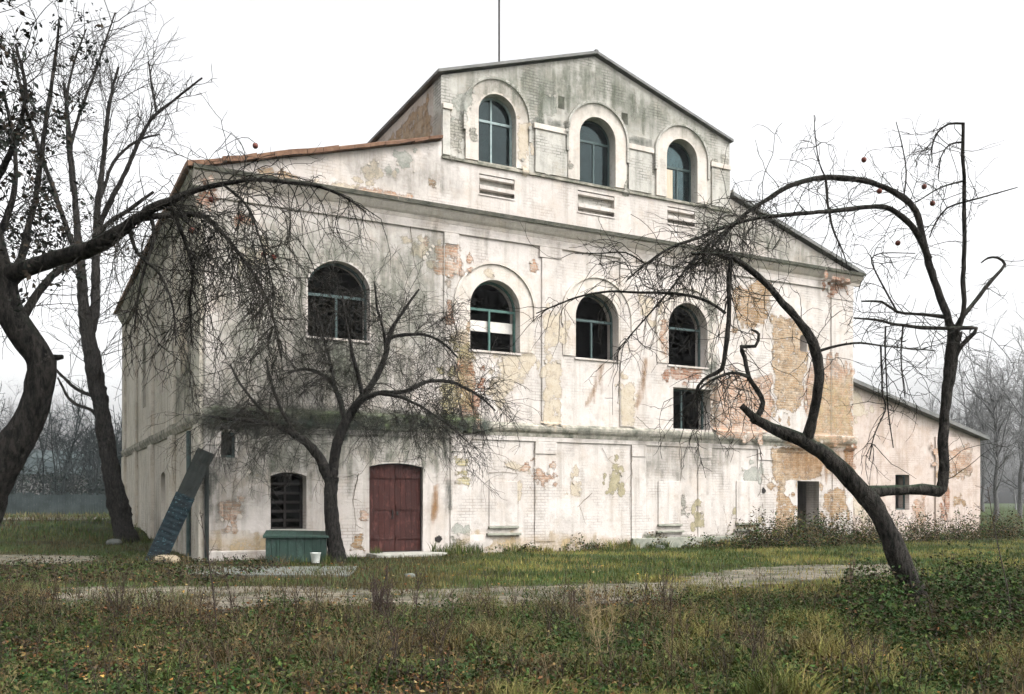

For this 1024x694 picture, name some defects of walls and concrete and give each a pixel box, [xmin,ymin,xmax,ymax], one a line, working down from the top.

flaking render [314,94,433,198]
flaking render [820,270,852,298]
flaking render [401,235,571,432]
flaking render [639,280,874,540]
flaking render [454,456,470,486]
flaking render [504,458,582,504]
flaking render [602,454,625,497]
flaking render [217,496,245,534]
flaking render [350,509,369,552]